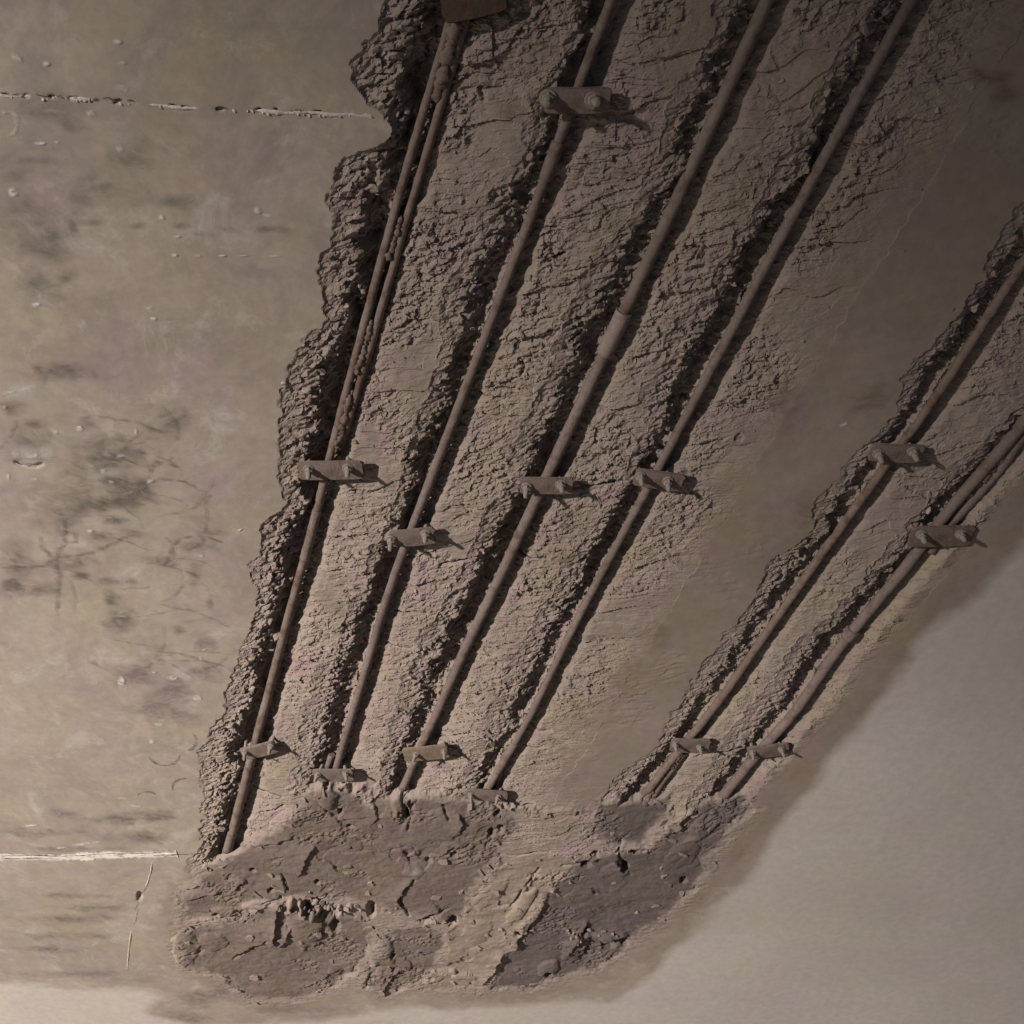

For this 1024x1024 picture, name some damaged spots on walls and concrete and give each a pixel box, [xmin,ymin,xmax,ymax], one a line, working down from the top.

spalling [183,0,1024,992]
crack [5,852,203,887]
crack [125,932,133,970]